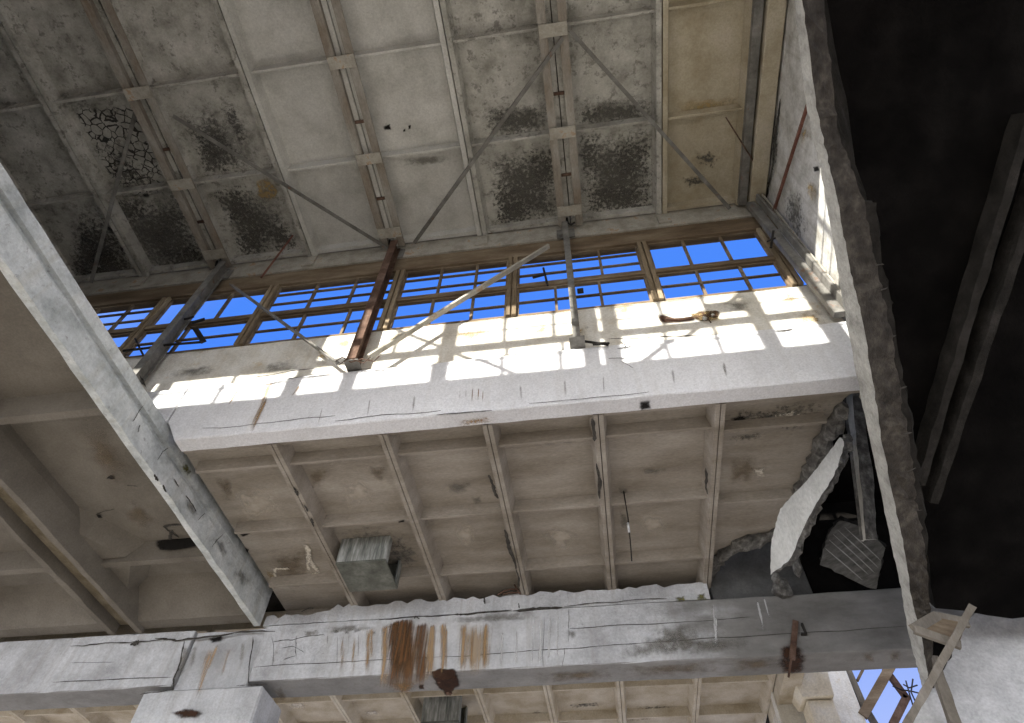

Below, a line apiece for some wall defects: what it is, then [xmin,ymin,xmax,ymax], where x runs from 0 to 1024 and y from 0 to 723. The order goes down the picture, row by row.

mould [188,109,245,176]
mould [493,149,555,223]
mould [580,134,651,212]
mould [74,216,129,275]
spalling [793,401,849,492]
crack [488,475,499,499]
spalling [711,528,775,583]
crack [379,530,901,665]
crack [61,608,391,695]
rust [341,620,447,693]
rust [460,624,488,669]
rust [781,646,804,674]